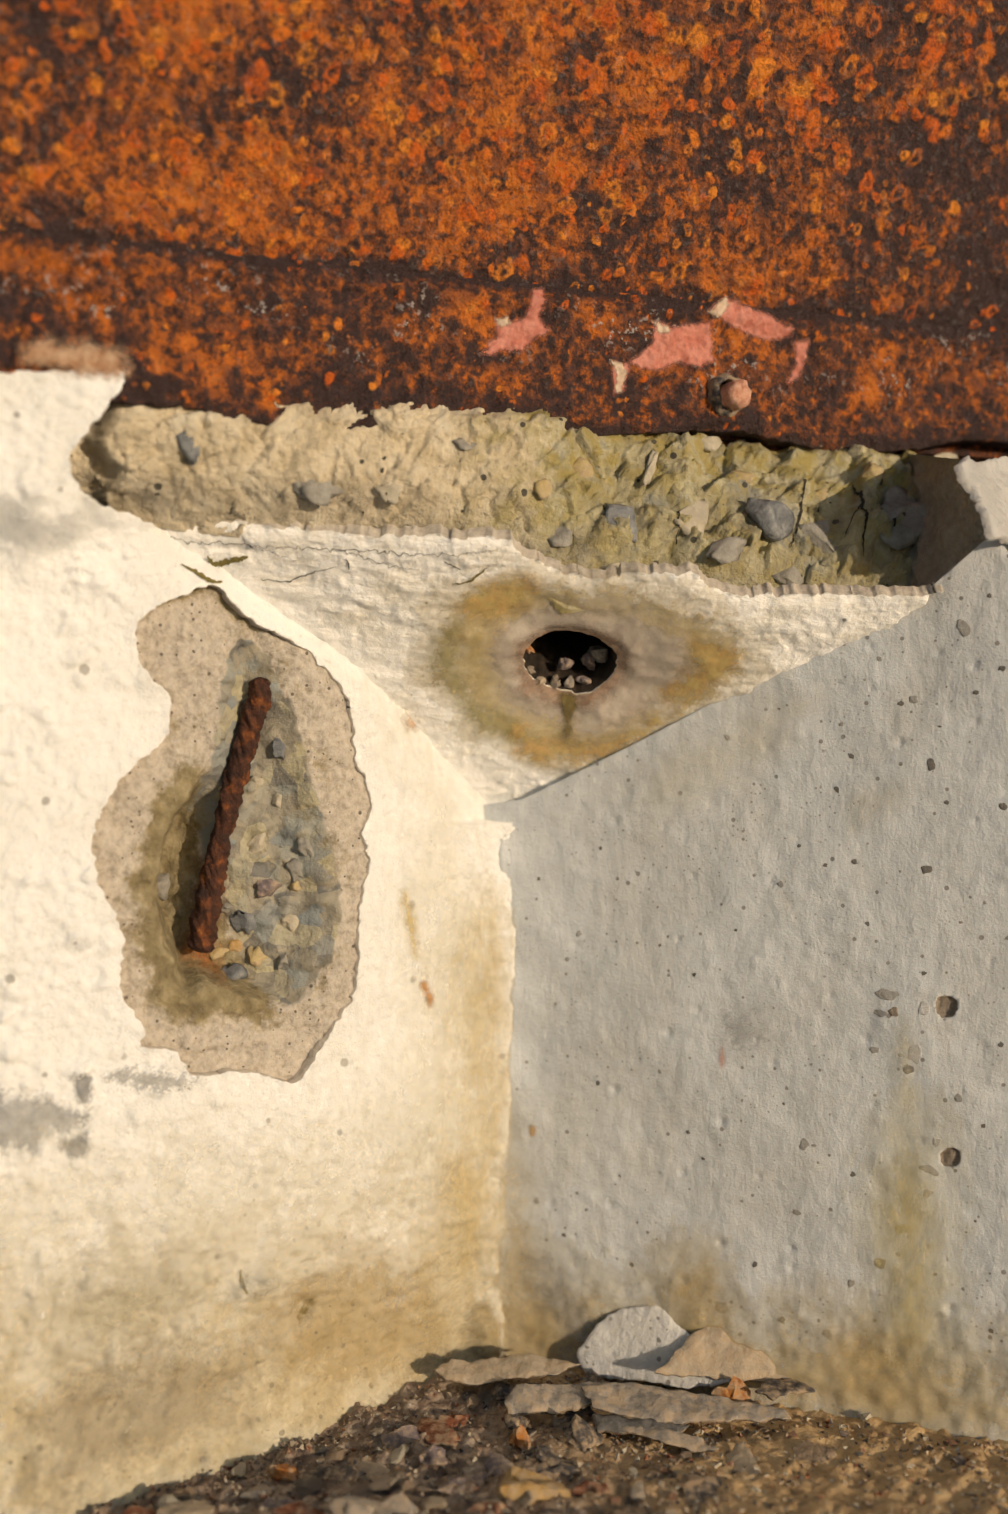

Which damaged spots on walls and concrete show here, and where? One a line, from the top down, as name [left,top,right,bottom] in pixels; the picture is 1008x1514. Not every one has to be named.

corrosion [20,339,131,377]
spalling [69,402,986,588]
spalling [0,586,370,1157]
peeling [435,1301,789,1435]
water stain [668,1287,700,1334]
water stain [636,1304,1008,1437]